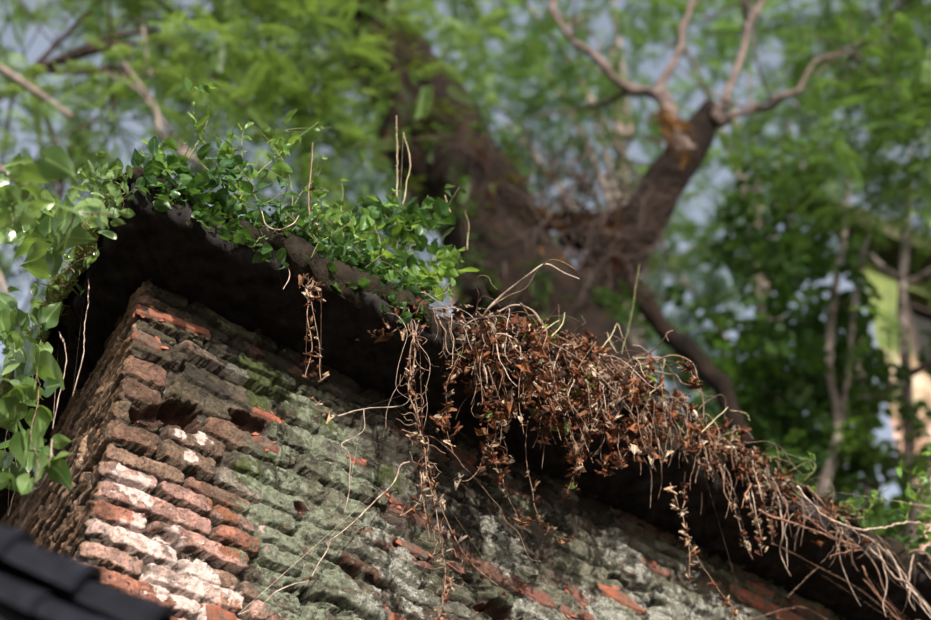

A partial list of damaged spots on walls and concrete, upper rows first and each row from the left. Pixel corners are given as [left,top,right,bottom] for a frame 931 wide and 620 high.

spalling [128,399,201,434]
damp [147,287,678,563]